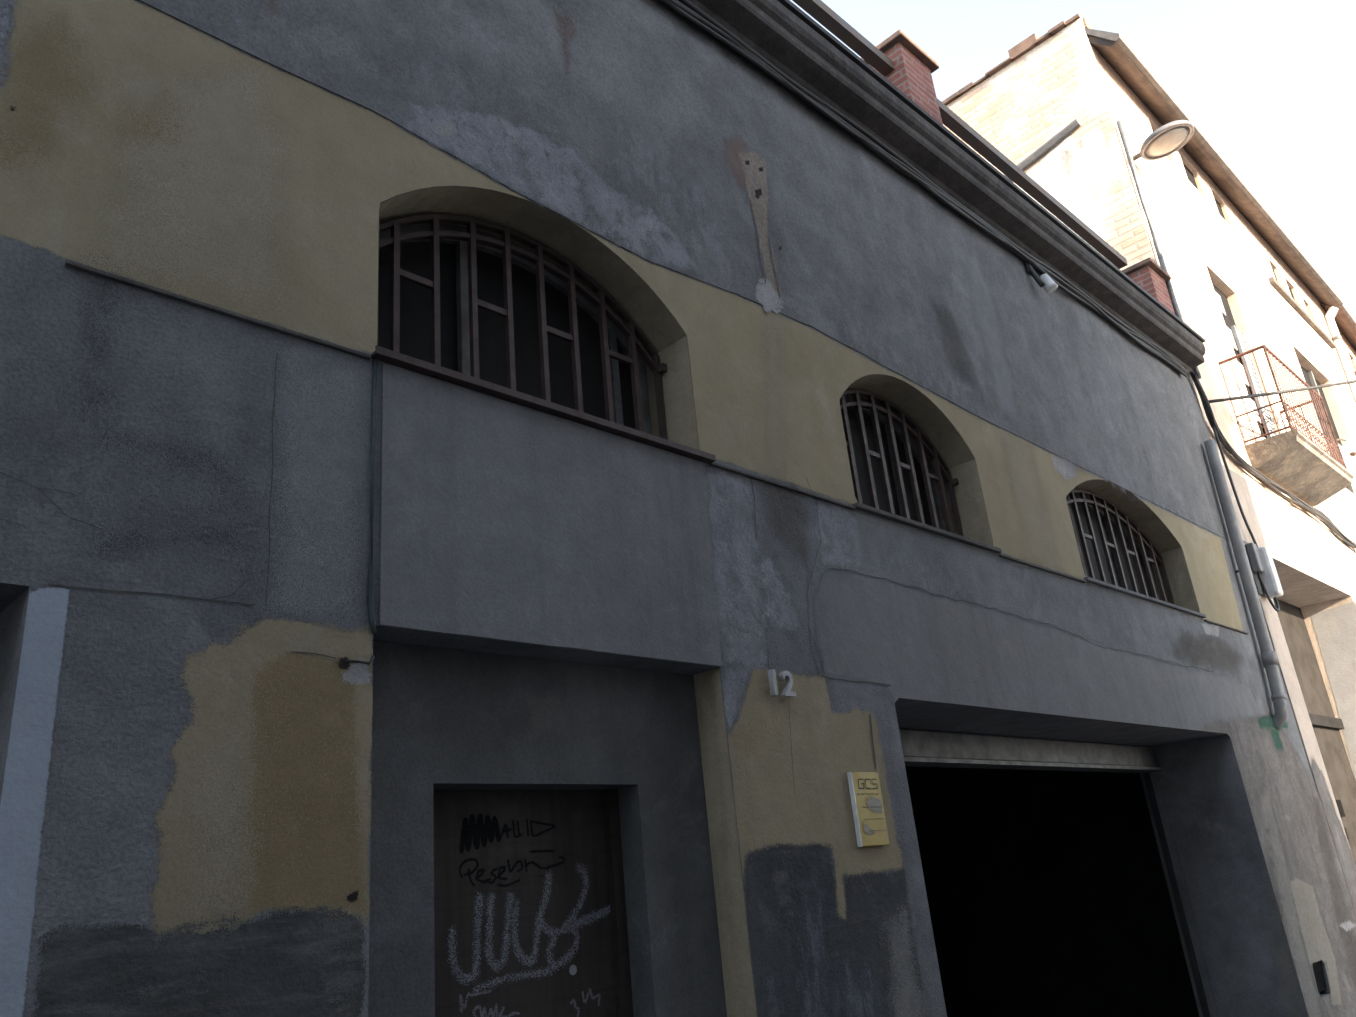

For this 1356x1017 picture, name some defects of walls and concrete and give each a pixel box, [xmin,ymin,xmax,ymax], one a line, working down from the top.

spalling [720,133,784,314]
crack [806,478,1212,686]
peeling [147,618,375,938]
peeling [727,667,903,921]